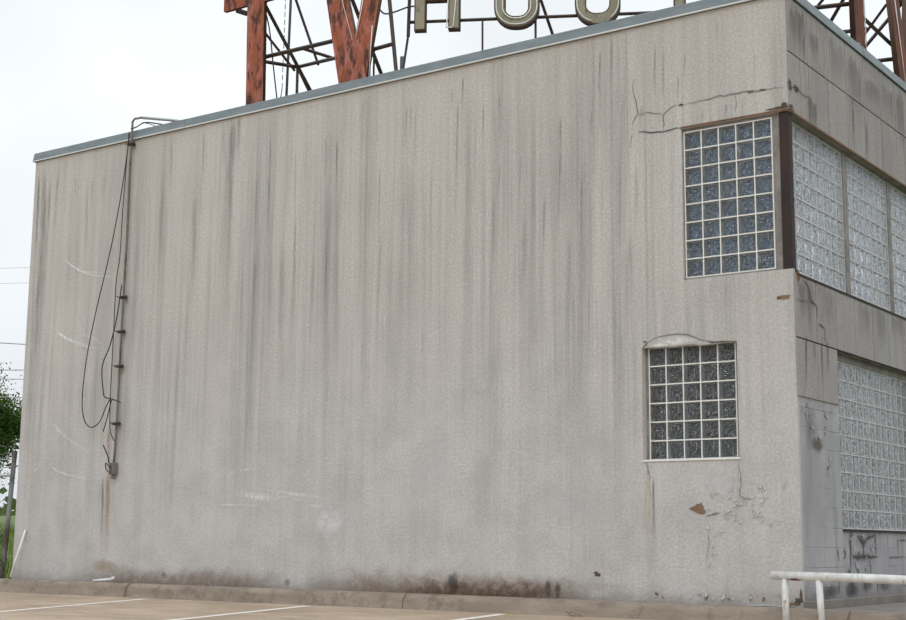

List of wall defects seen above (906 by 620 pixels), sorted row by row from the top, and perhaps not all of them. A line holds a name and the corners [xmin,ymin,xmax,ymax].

crack [630,80,781,145]
crack [796,279,826,342]
peeling [689,483,780,576]